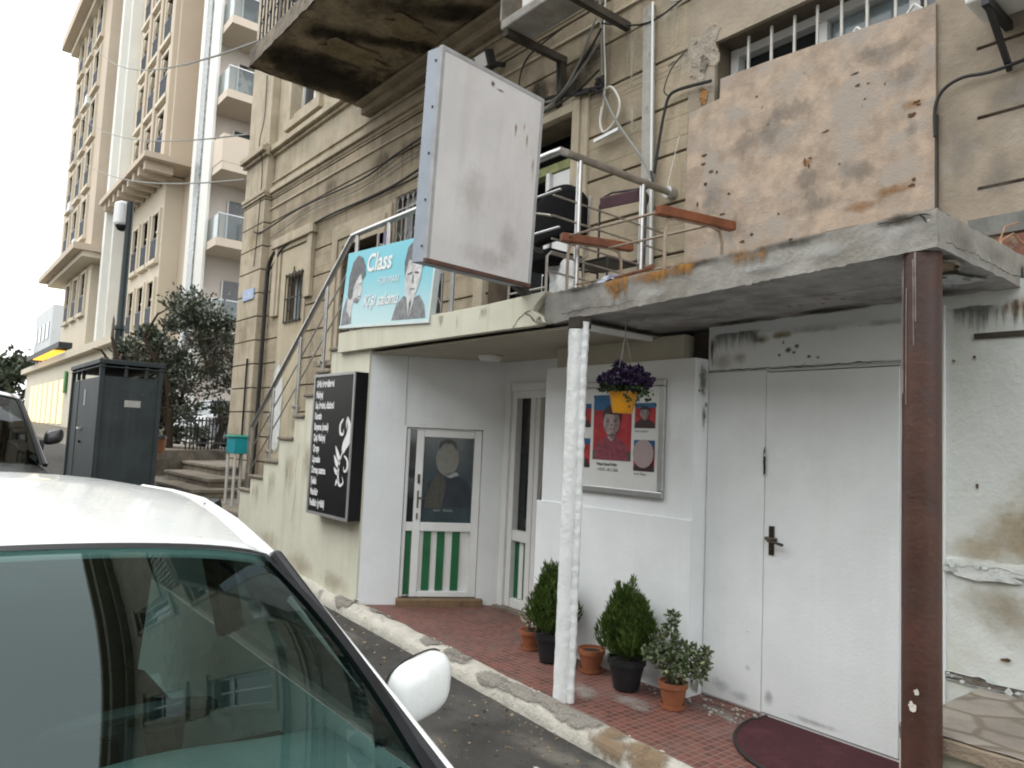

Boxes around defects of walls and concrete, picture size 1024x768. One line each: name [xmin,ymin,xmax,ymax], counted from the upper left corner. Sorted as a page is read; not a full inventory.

leakage [373,1,485,22]
leakage [308,29,431,53]
flaking render [687,23,721,91]
leakage [269,49,375,115]
corrosion [605,263,692,301]
leakage [788,305,863,314]
leakage [689,306,798,356]
peeling [943,559,1024,585]